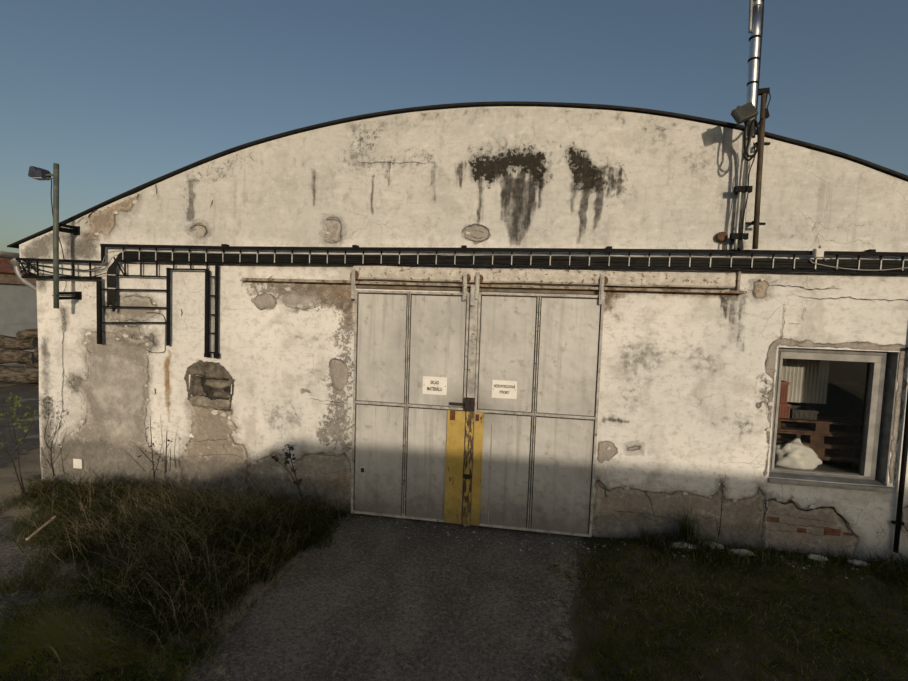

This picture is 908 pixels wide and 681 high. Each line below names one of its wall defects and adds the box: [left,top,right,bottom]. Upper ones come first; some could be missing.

flaking render [24,194,139,259]
leakage [457,145,548,241]
leakage [564,142,622,236]
flaking render [41,280,355,512]
peeling [597,441,641,463]
peeling [756,337,908,484]
flaking render [592,479,858,559]